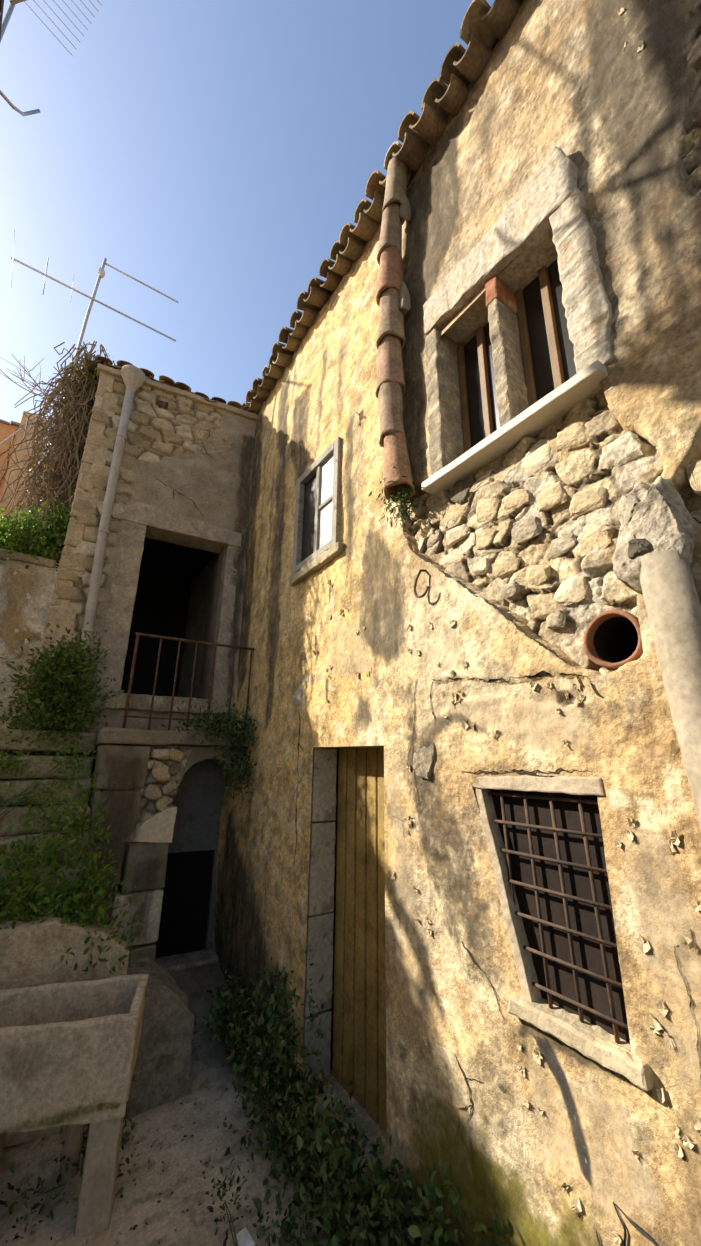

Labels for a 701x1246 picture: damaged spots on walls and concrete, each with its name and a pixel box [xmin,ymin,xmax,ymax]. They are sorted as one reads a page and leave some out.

water stain [587,0,693,256]
spalling [677,0,701,197]
spalling [679,460,701,522]
spalling [406,389,664,748]
crack [392,506,603,836]
peeling [390,810,418,902]
peeling [616,818,636,848]
peeling [668,830,680,855]
peeling [635,929,658,961]
peeling [675,929,701,978]
peeling [649,999,694,1062]